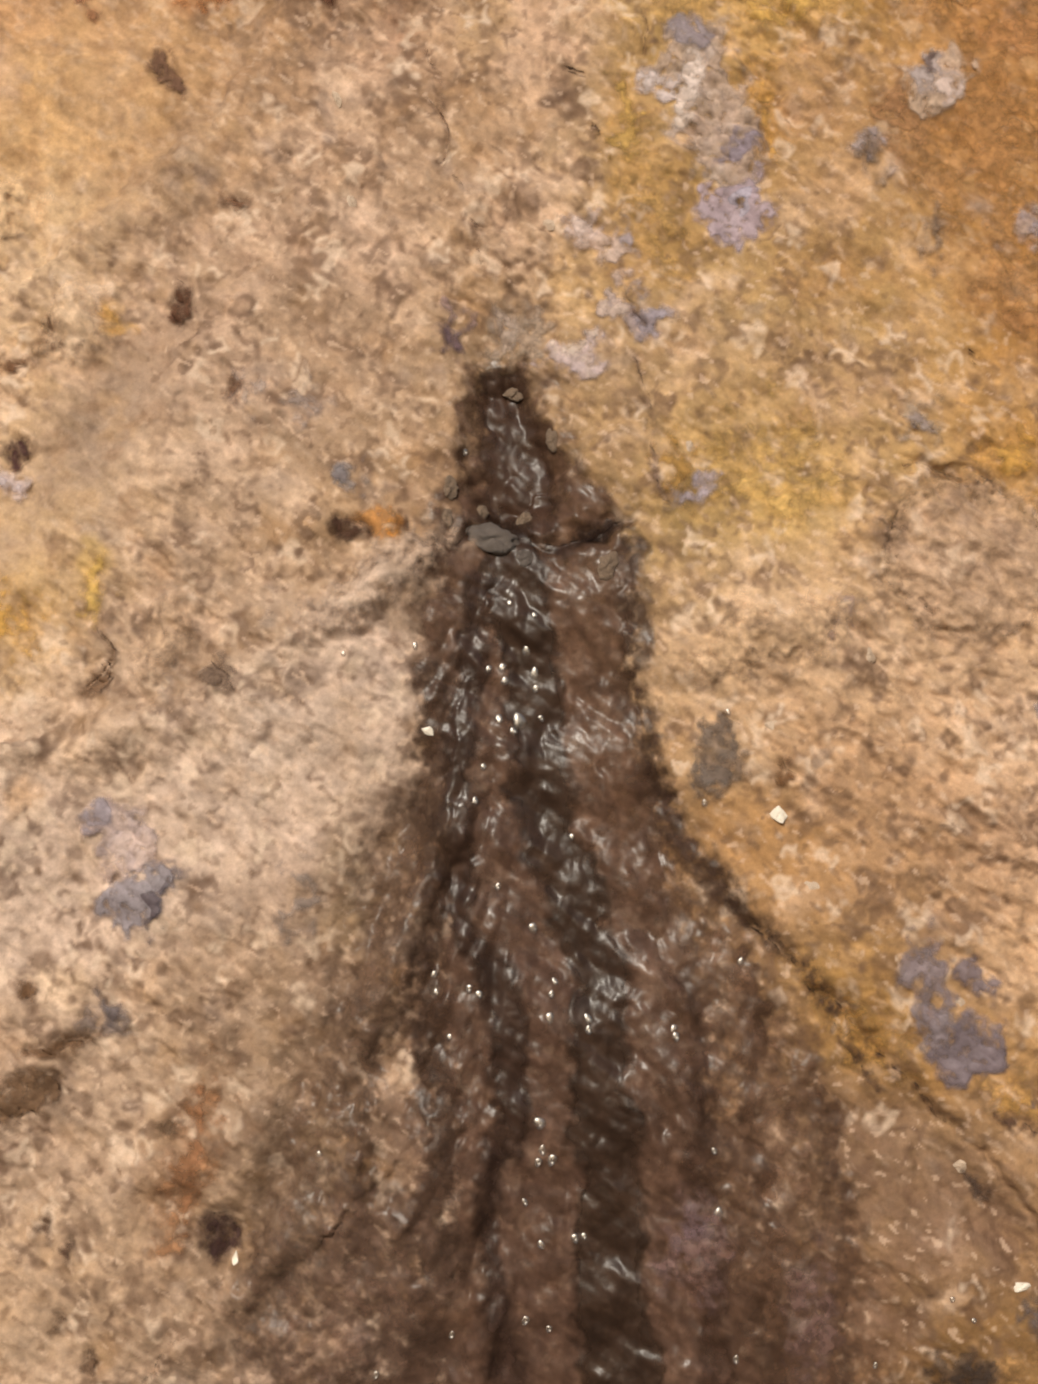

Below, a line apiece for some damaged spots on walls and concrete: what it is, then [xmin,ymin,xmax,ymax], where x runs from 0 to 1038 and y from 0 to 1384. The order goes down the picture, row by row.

leakage [230,357,863,1384]
leakage [827,990,912,1066]